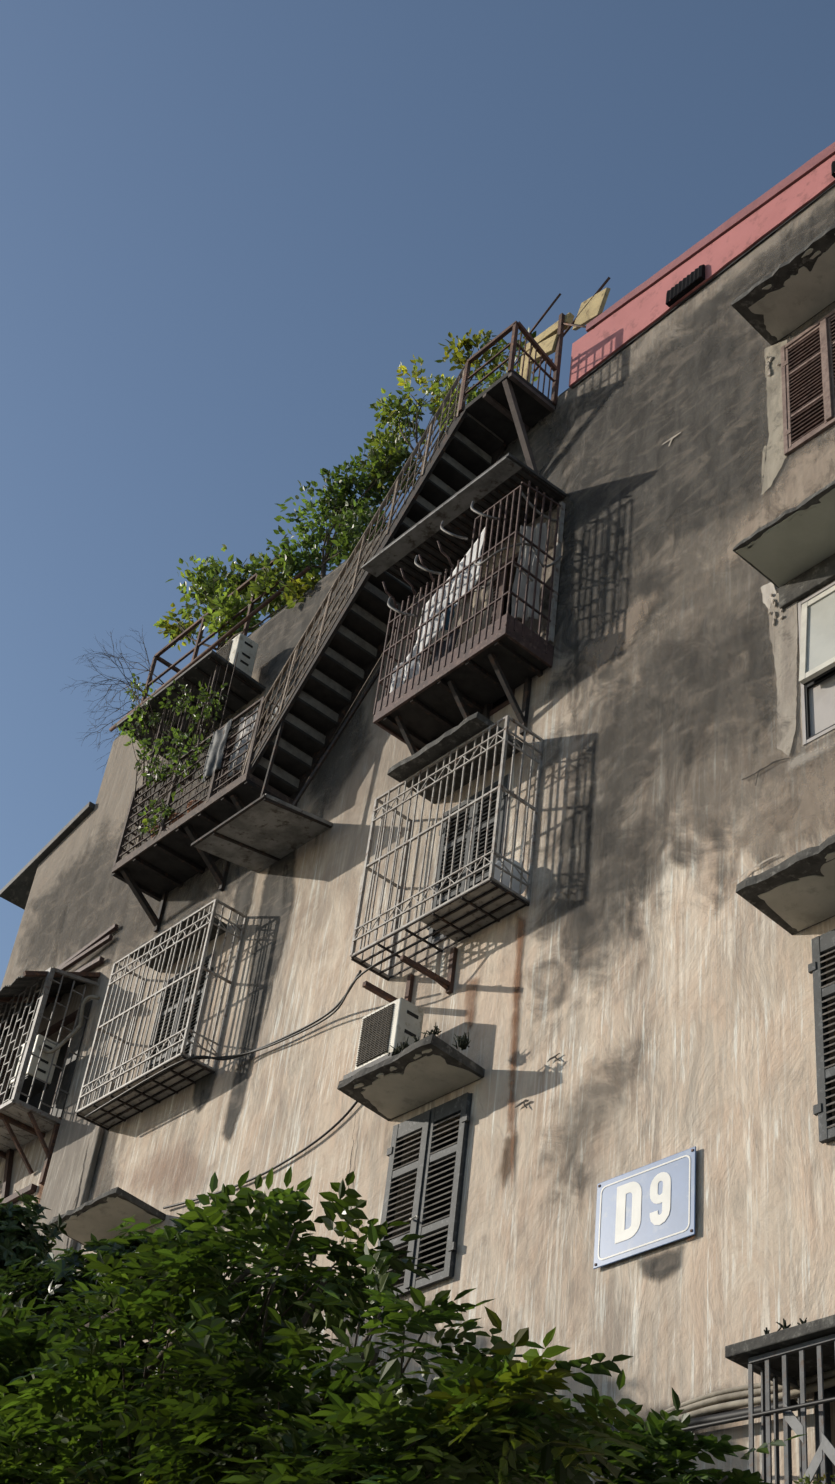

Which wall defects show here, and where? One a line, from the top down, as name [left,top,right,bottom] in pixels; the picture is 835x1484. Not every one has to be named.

flaking render [717,243,835,767]
damp [22,709,296,1140]
damp [557,622,772,943]
flaking render [758,852,835,931]